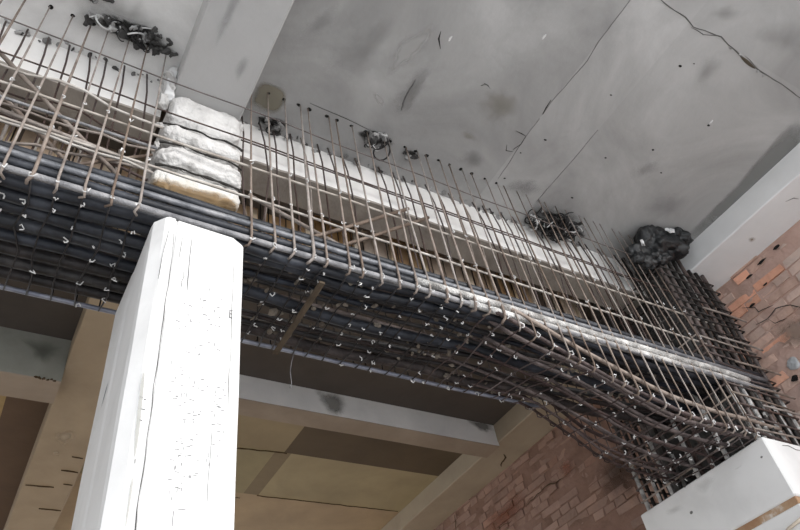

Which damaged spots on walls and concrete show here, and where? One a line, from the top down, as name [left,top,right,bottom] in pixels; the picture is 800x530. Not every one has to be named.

spalling [4,18,119,72]
crack [661,0,800,98]
spalling [83,0,248,212]
spalling [258,117,587,249]
leakage [324,396,340,412]